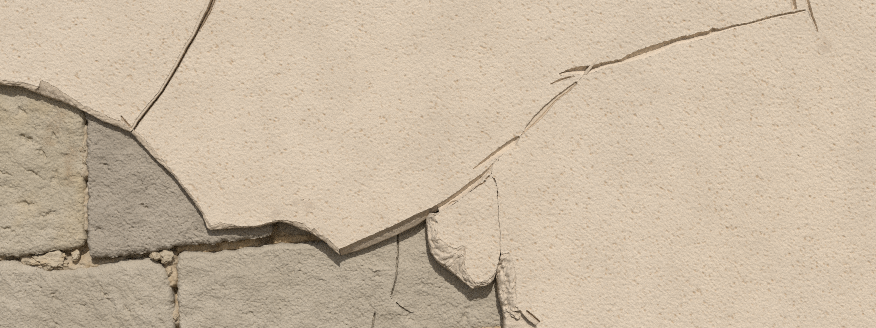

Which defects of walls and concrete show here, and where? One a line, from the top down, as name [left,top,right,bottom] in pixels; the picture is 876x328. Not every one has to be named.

crack [121,0,217,129]
flaking render [0,80,540,328]
crack [437,0,818,226]